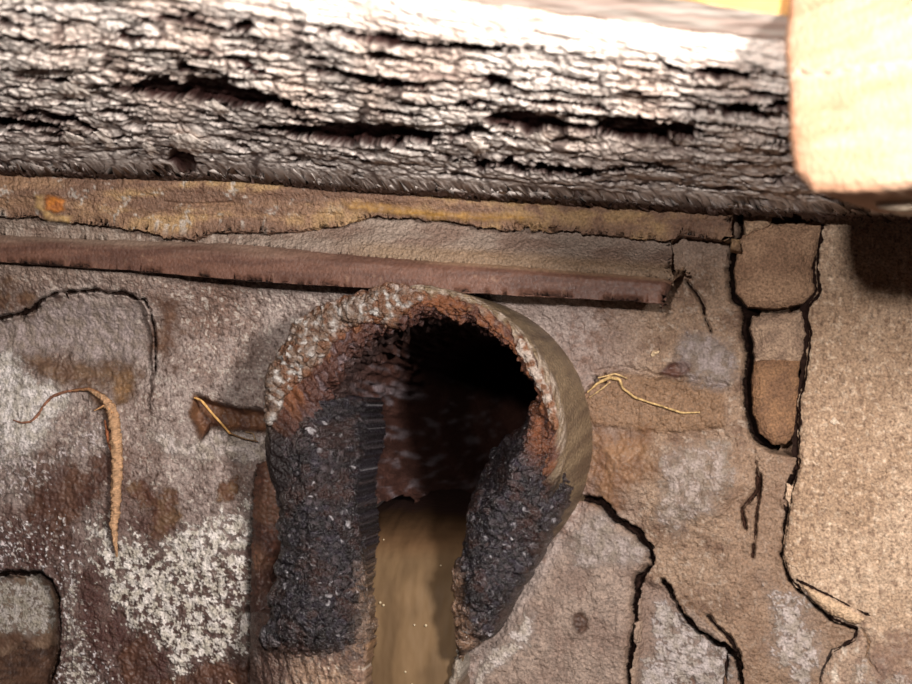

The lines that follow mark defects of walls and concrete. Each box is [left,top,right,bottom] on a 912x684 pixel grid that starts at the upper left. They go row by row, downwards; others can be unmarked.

rust [36,196,71,222]
crack [0,288,157,372]
rust [147,295,184,356]
rust [0,234,691,309]
crack [686,281,711,332]
crack [729,214,880,682]
water stain [0,301,266,684]
crack [584,496,744,684]